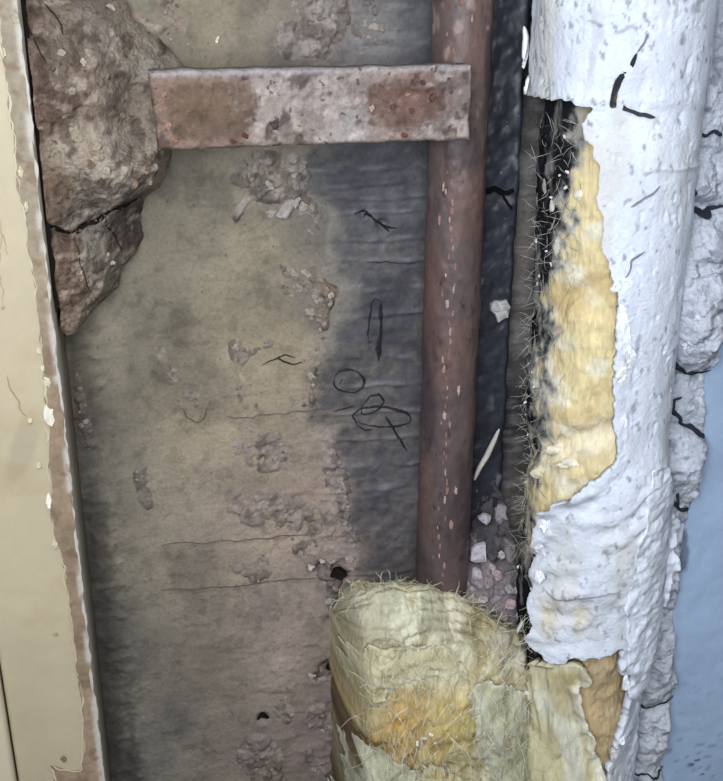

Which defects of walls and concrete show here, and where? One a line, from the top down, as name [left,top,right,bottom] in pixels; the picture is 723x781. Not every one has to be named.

spalling [273,0,385,66]
corrosion [158,84,254,144]
corrosion [368,80,440,138]
flaking render [522,42,530,95]
crack [610,33,656,119]
spalling [228,149,320,246]
leakage [306,141,427,581]
flaking render [615,305,637,385]
flaking render [539,519,550,534]